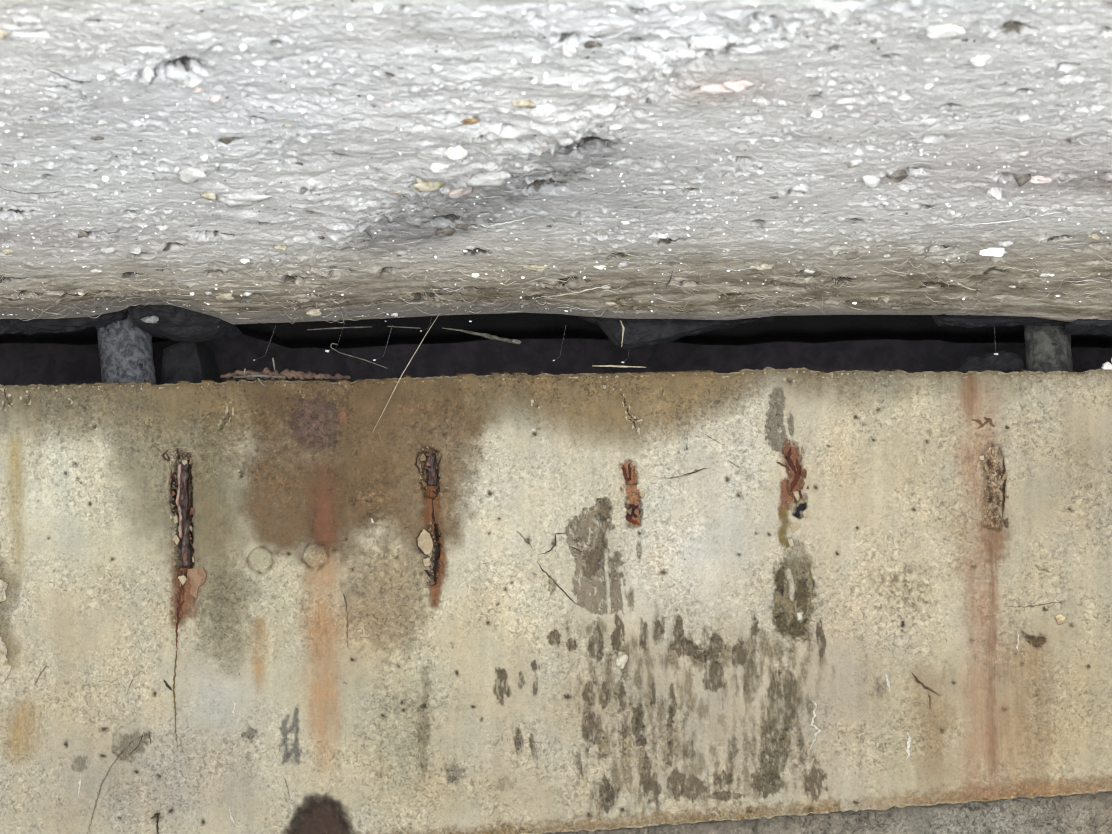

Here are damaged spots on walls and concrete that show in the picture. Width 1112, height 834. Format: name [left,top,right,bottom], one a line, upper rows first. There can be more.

leakage [764,369,903,454]
leakage [0,367,769,639]
spalling [979,443,1009,551]
peeling [0,562,18,684]
leakage [493,660,540,705]
leakage [547,497,834,817]
leakage [514,728,534,758]
leakage [287,796,350,834]